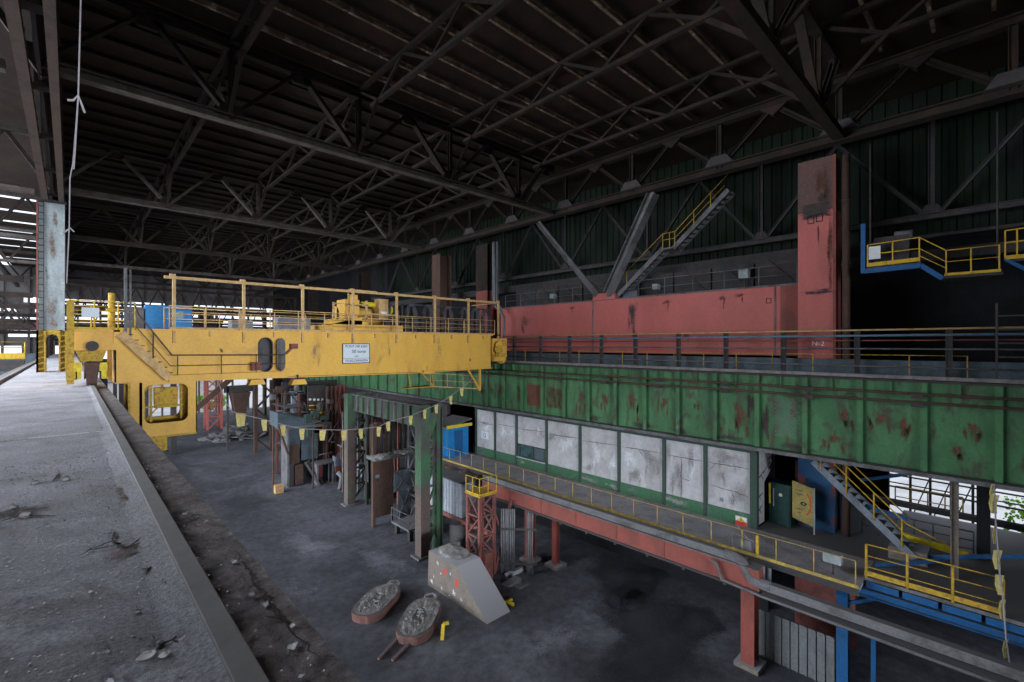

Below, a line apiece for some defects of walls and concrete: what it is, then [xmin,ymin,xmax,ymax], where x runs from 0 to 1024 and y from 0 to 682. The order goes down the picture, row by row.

crack [481,422,763,512]